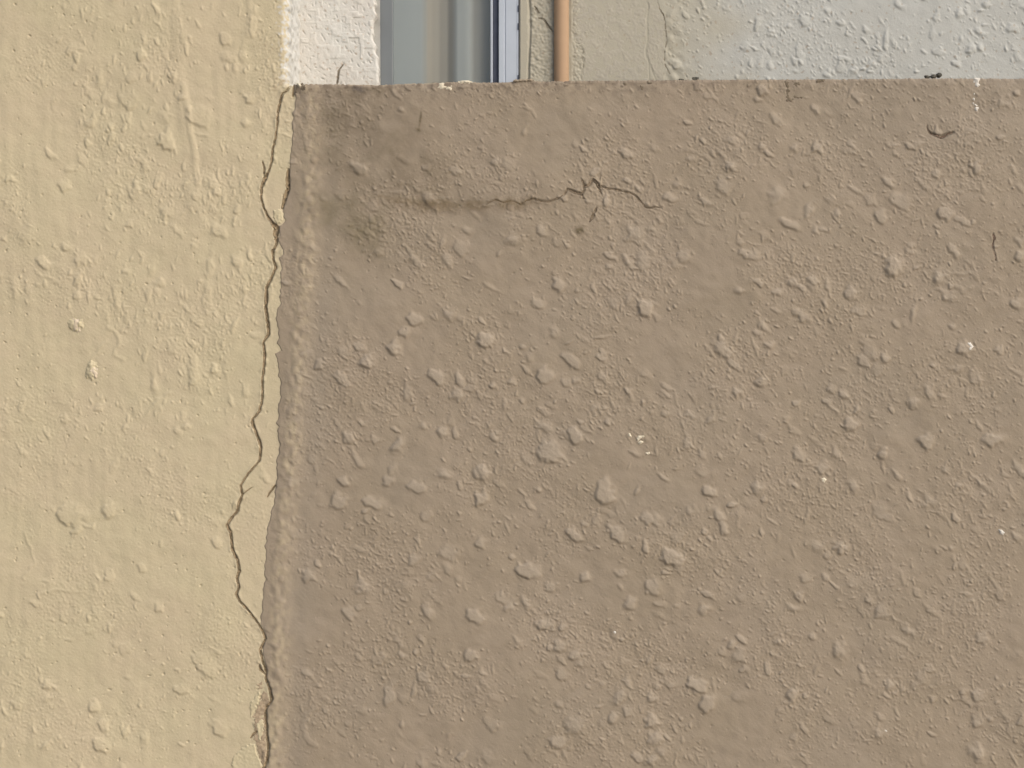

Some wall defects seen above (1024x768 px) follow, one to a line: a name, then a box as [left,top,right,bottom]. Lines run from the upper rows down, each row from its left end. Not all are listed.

crack [226,84,295,768]
crack [489,176,659,221]